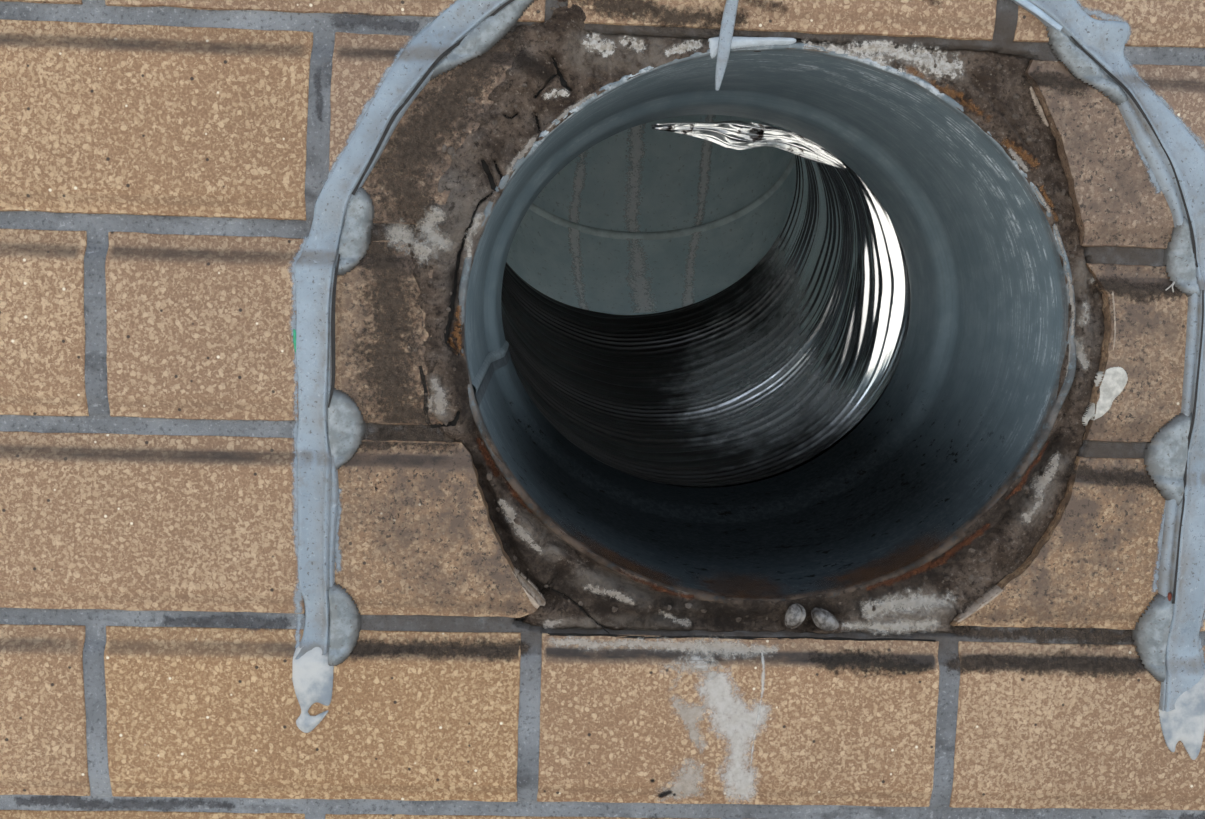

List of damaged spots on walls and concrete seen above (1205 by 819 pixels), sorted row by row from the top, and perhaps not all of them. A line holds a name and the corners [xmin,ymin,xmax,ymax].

rust [476,438,533,513]
rust [834,523,990,591]
leakage [554,637,777,799]